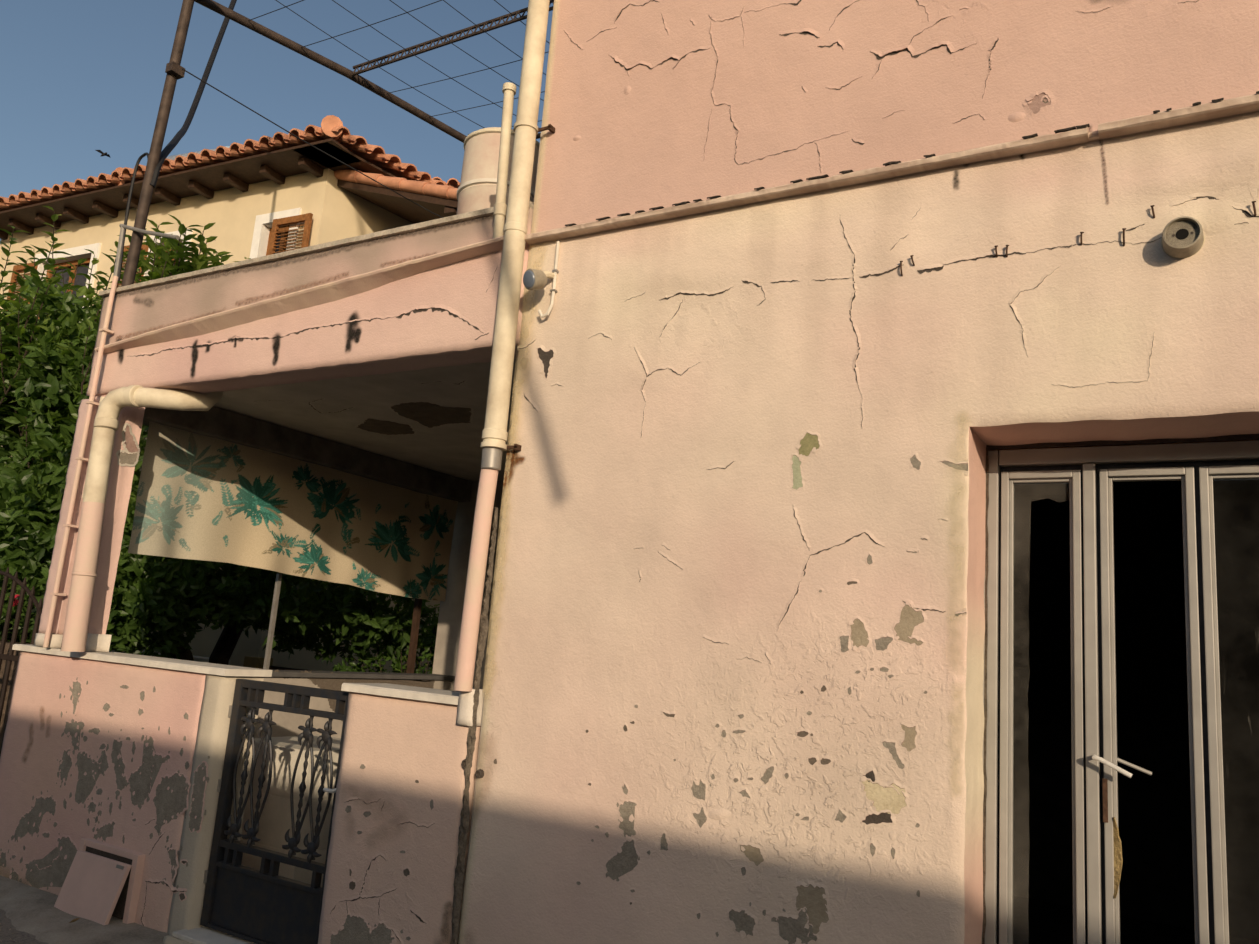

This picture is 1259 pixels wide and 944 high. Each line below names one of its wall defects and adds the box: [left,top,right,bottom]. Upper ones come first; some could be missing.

crack [564,0,999,173]
damp [191,340,212,377]
crack [127,304,489,357]
damp [346,313,361,351]
crack [587,192,1259,438]
crack [701,504,949,665]
spalling [837,599,927,696]
peeling [0,677,210,902]
crack [329,852,427,944]
peeling [590,781,670,906]
spalling [716,881,832,944]
spalling [833,721,920,861]